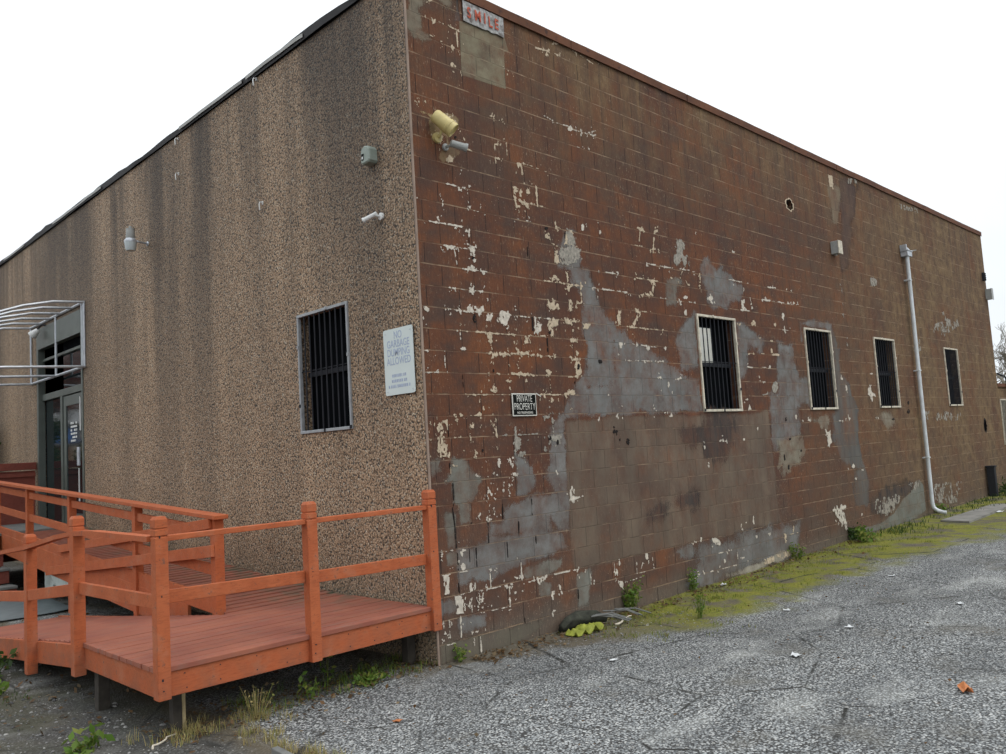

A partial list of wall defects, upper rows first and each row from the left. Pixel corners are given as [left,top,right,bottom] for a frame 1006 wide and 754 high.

peeling [406,0,514,89]
spalling [494,138,551,222]
peeling [729,279,799,333]
peeling [424,183,715,522]
peeling [747,337,779,397]
spalling [833,504,848,530]
spalling [875,494,900,516]
peeling [441,542,595,652]
peeling [614,553,654,589]
peeling [692,537,744,579]
spalling [764,526,798,564]